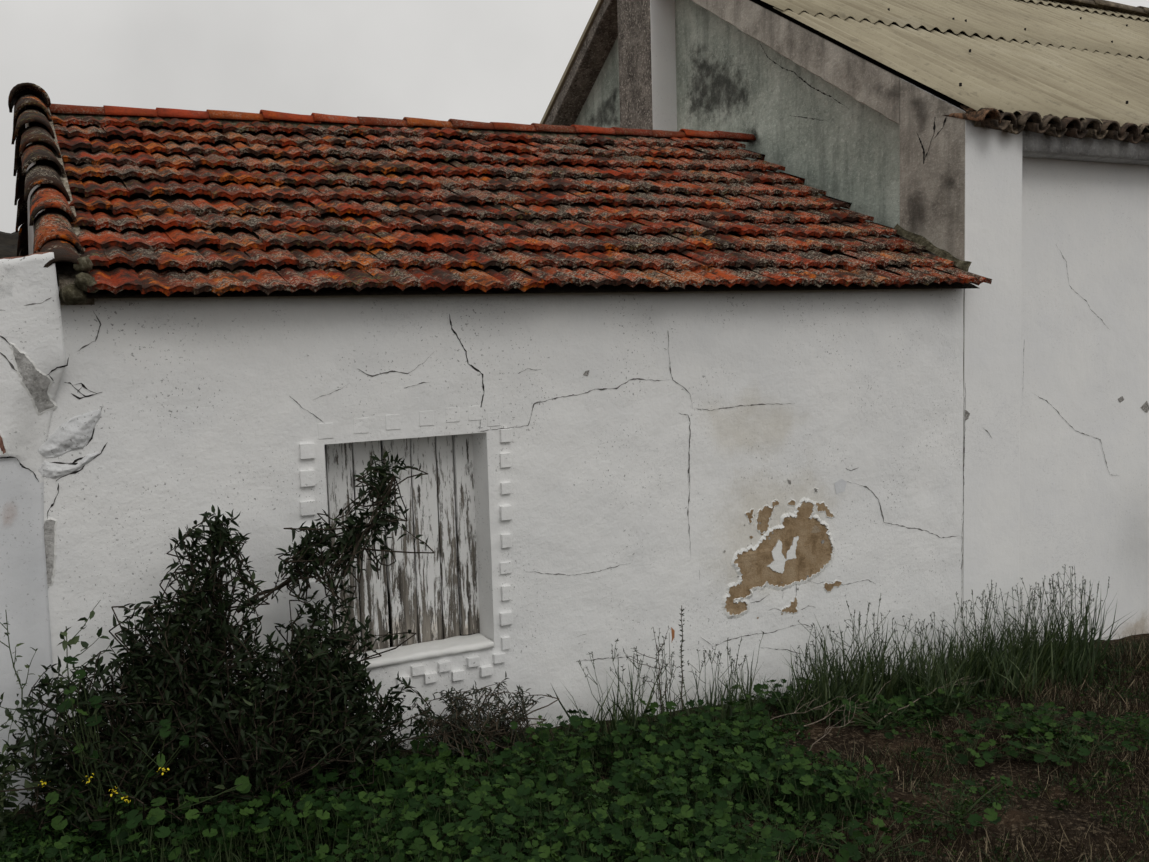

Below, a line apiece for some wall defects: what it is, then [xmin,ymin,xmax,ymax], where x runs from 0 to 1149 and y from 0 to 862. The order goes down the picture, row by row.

crack [0,311,107,519]
crack [449,314,795,579]
peeling [721,487,842,619]
crack [846,430,992,569]